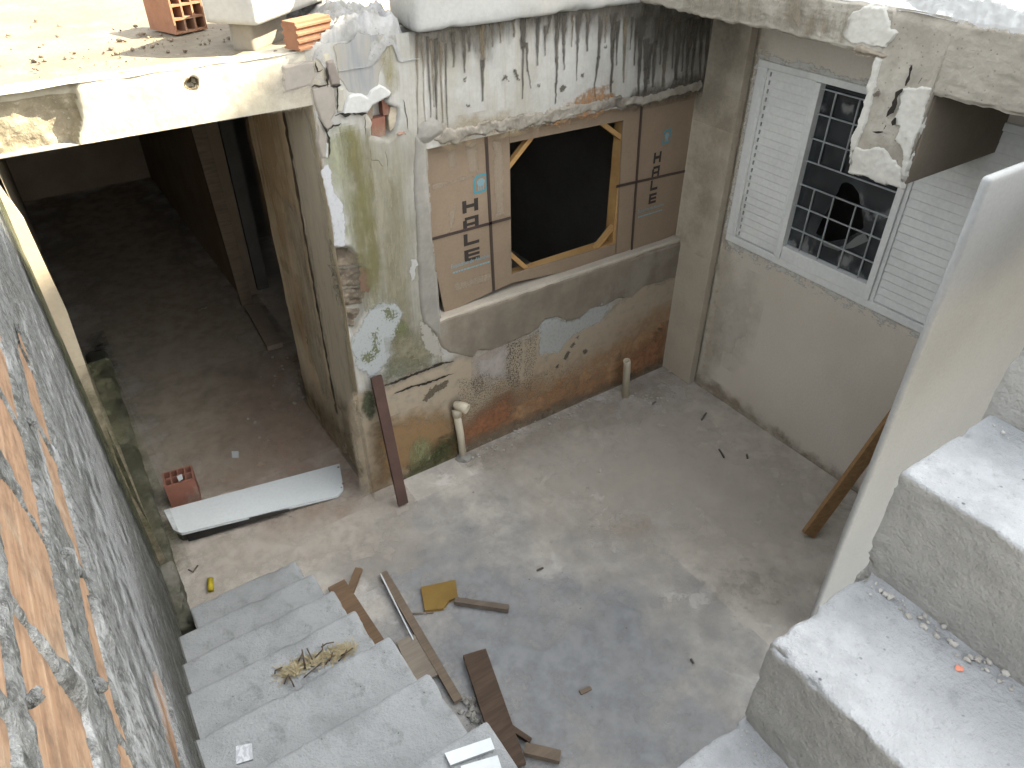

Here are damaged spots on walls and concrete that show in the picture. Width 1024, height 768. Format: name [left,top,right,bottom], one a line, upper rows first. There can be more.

spalling [0,93,83,154]
damp [415,3,739,122]
peeling [839,3,932,190]
crack [874,65,922,133]
peeling [281,33,407,413]
damp [347,126,378,295]
crack [385,361,453,394]
damp [353,276,676,494]
peeling [539,303,610,355]